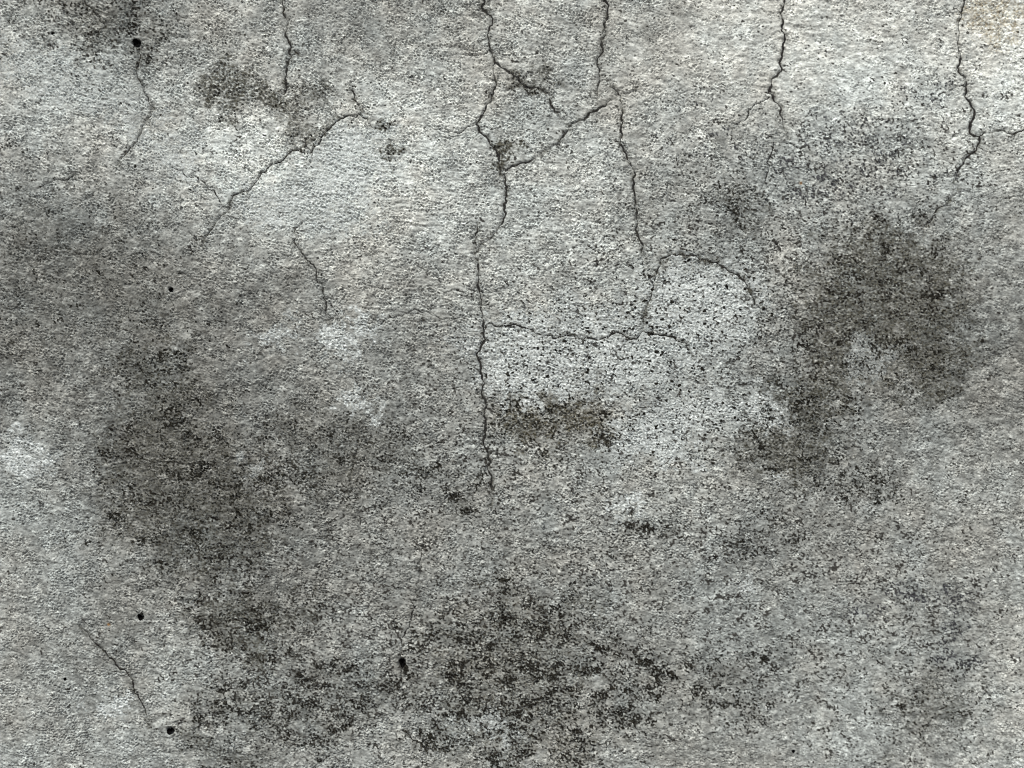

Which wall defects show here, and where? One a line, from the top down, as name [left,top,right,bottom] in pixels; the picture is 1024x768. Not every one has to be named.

leakage [0,229,111,352]
crack [121,59,154,159]
crack [174,91,372,237]
crack [281,0,292,96]
crack [294,227,327,314]
crack [378,0,755,506]
leakage [674,146,768,239]
leakage [709,112,1000,571]
crack [926,0,1024,224]
leakage [58,261,816,768]